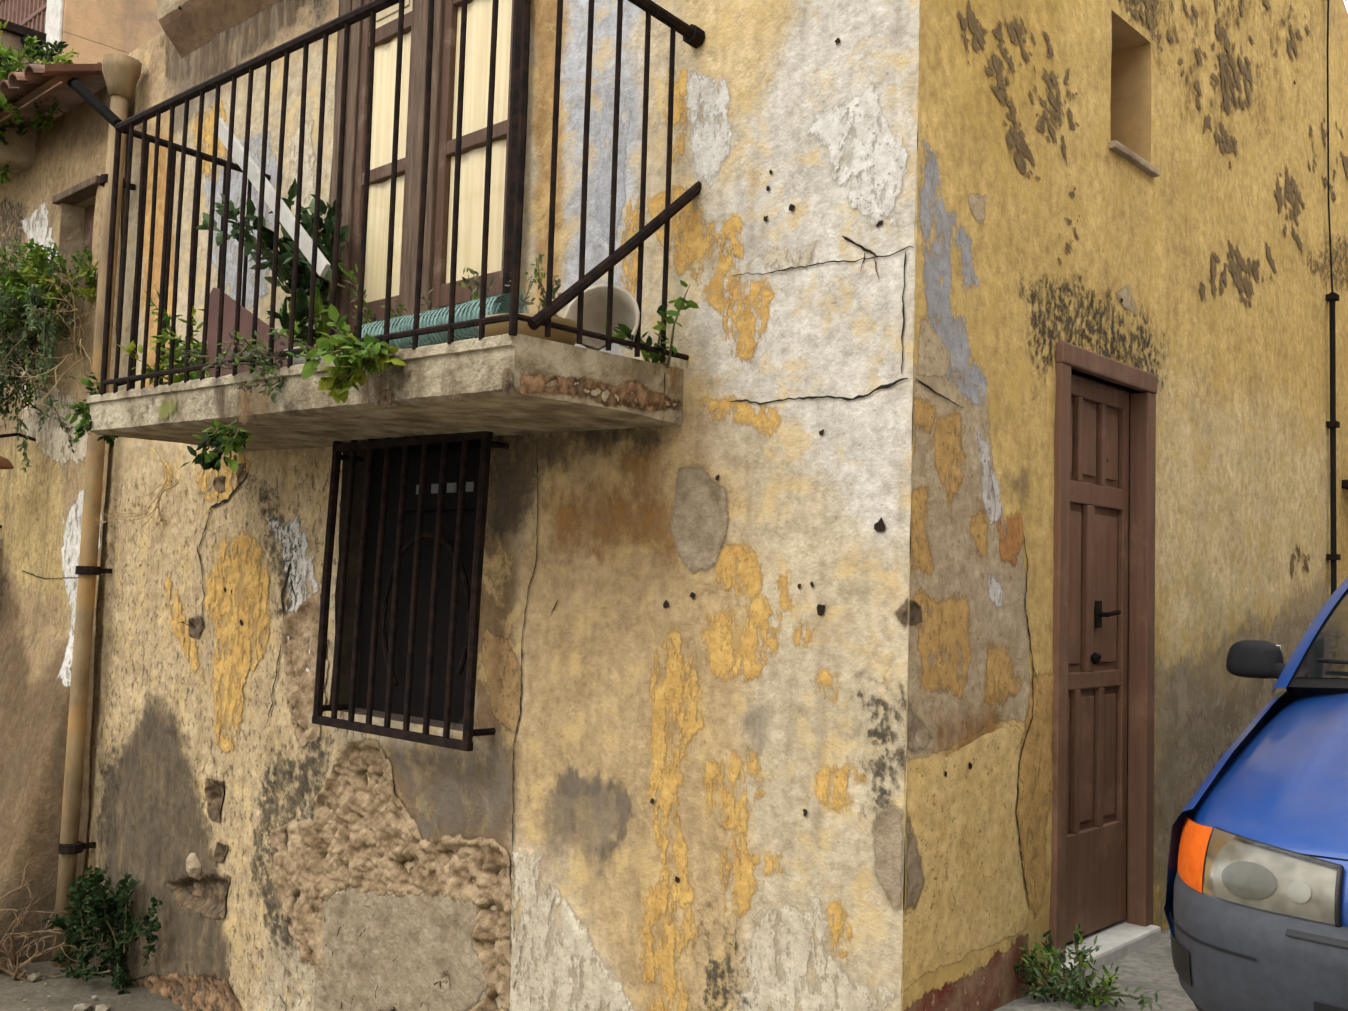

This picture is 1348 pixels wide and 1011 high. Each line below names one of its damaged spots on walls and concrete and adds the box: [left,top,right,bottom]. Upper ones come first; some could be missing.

peeling [957,0,1080,180]
peeling [1120,0,1259,171]
spalling [502,367,681,411]
peeling [595,68,819,361]
crack [729,236,965,408]
peeling [1199,239,1277,308]
peeling [1274,164,1305,257]
peeling [165,515,329,752]
spalling [639,466,815,1011]
peeling [701,80,1054,1011]
crack [988,462,1039,909]
spalling [270,739,512,1011]